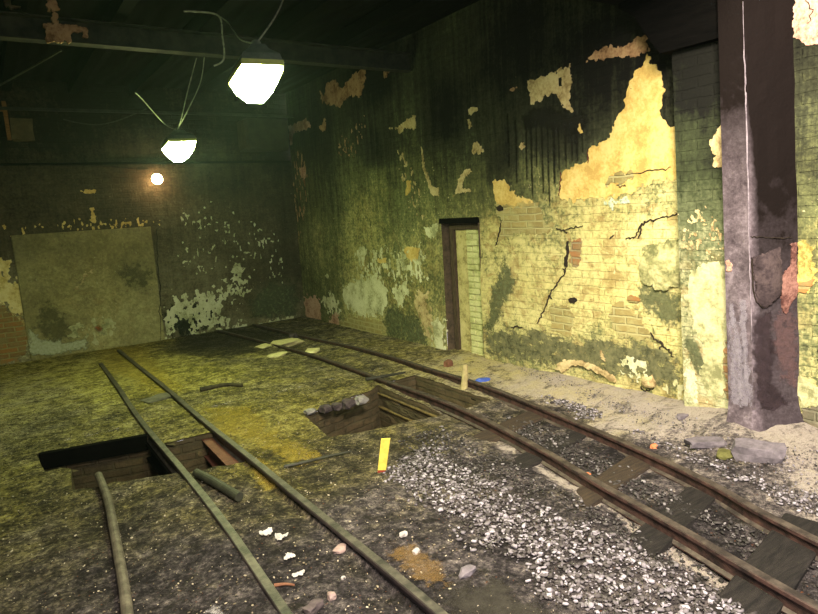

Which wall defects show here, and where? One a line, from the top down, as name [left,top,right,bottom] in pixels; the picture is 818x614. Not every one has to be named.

flaking render [792,0,818,45]
flaking render [319,69,366,108]
damp [507,114,583,202]
flaking render [527,63,574,113]
flaking render [558,35,676,204]
flaking render [709,125,722,168]
flaking render [62,207,160,231]
flaking render [492,179,555,246]
crack [609,213,677,240]
flaking render [0,257,25,326]
damp [342,242,448,350]
crack [511,225,583,329]